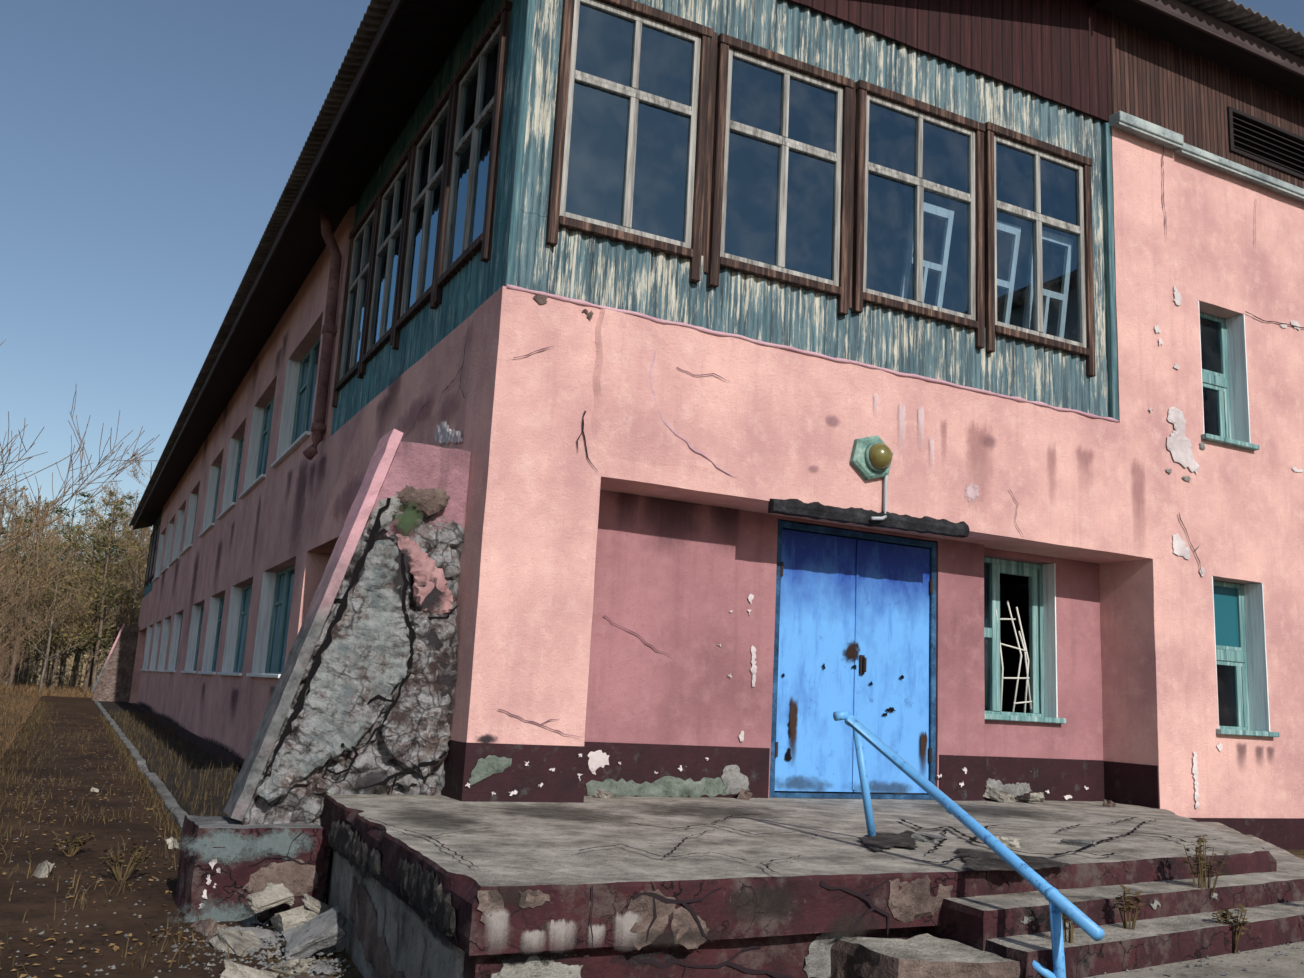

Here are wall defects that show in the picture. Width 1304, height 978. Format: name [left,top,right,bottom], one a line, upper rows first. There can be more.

crack [1245,311,1304,328]
crack [649,351,738,477]
crack [577,411,597,470]
spalling [258,485,459,803]
crack [604,615,671,656]
corrosion [844,641,860,660]
crack [498,709,579,737]
corrosion [790,699,798,752]
spalling [465,755,529,796]
spalling [577,750,750,798]
spalling [242,859,318,897]
spalling [627,889,710,950]